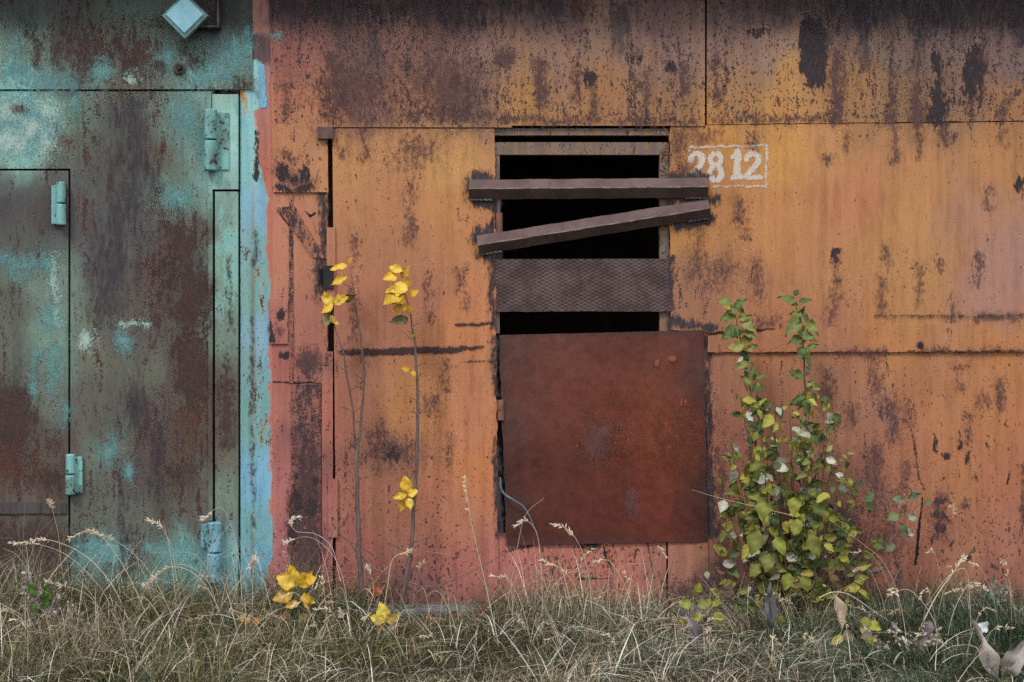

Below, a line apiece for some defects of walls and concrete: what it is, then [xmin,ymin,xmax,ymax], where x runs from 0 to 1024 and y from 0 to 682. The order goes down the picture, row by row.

peeling [0,37,82,163]
peeling [90,57,142,89]
rust [312,50,600,168]
rust [617,52,835,177]
rust [886,37,988,166]
rust [1013,175,1024,198]
peeling [0,247,63,334]
peeling [77,329,99,355]
peeling [112,319,152,359]
rust [268,308,322,377]
rust [933,414,989,465]
peeling [68,531,213,602]